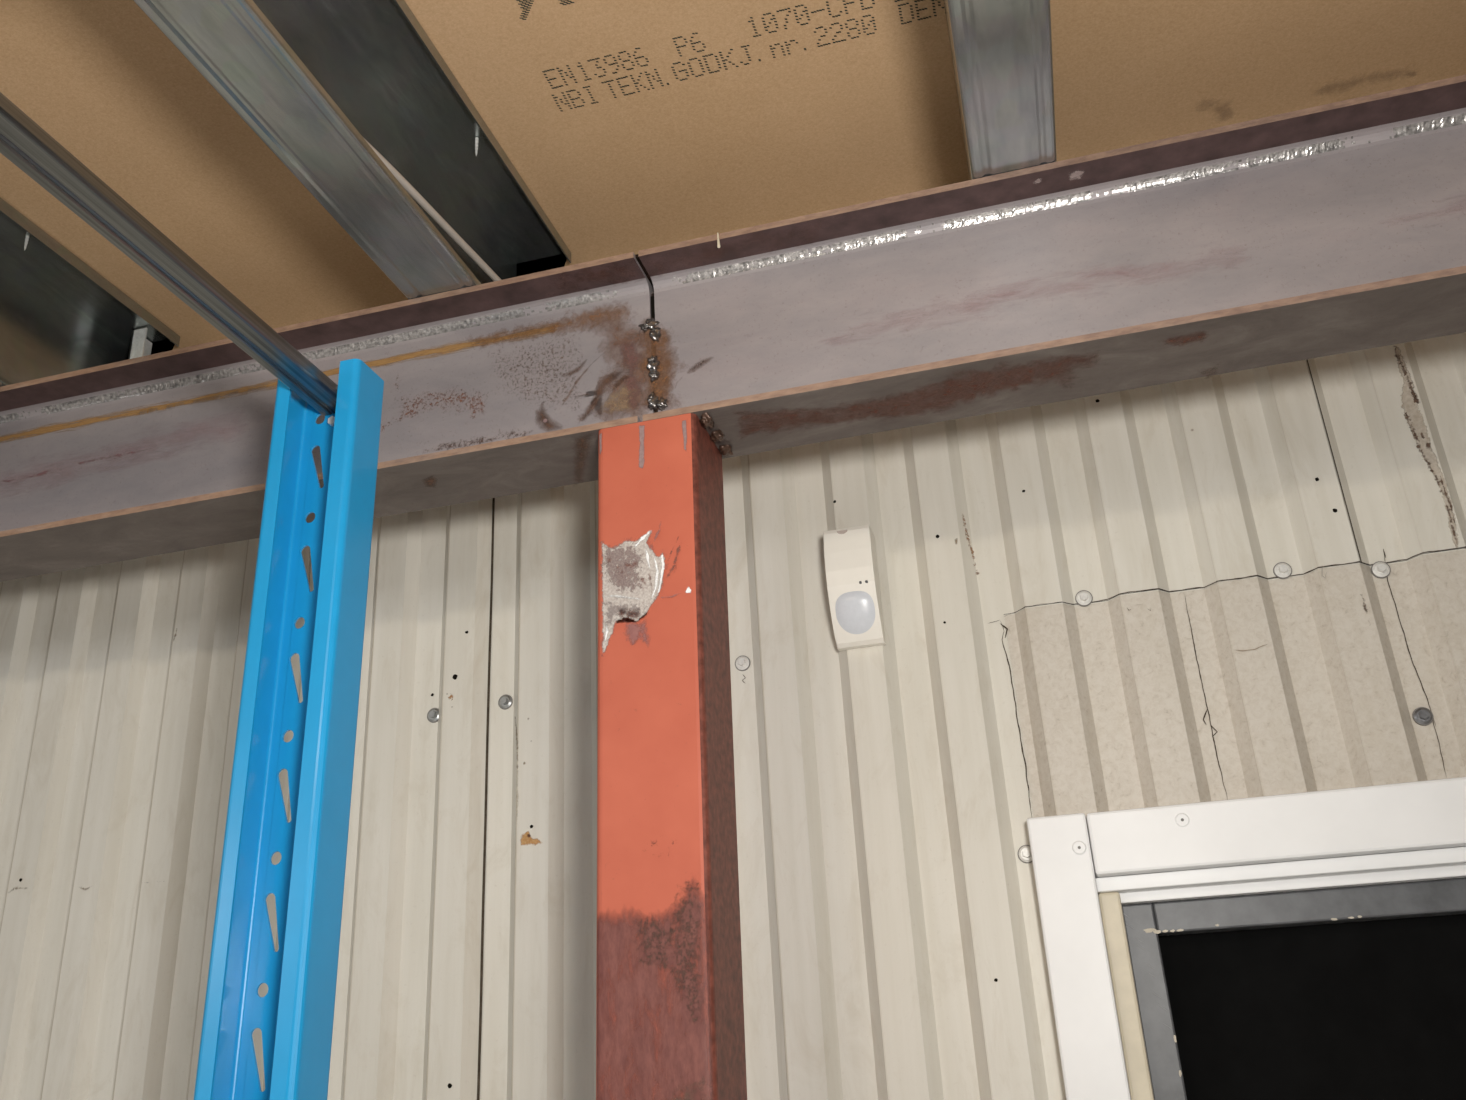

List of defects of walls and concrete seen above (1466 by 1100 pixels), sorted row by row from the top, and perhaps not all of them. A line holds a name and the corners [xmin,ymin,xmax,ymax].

rust [0,379,278,442]
rust [365,309,671,416]
peeling [602,531,691,652]
crack [990,546,1466,816]
rust [521,832,540,845]